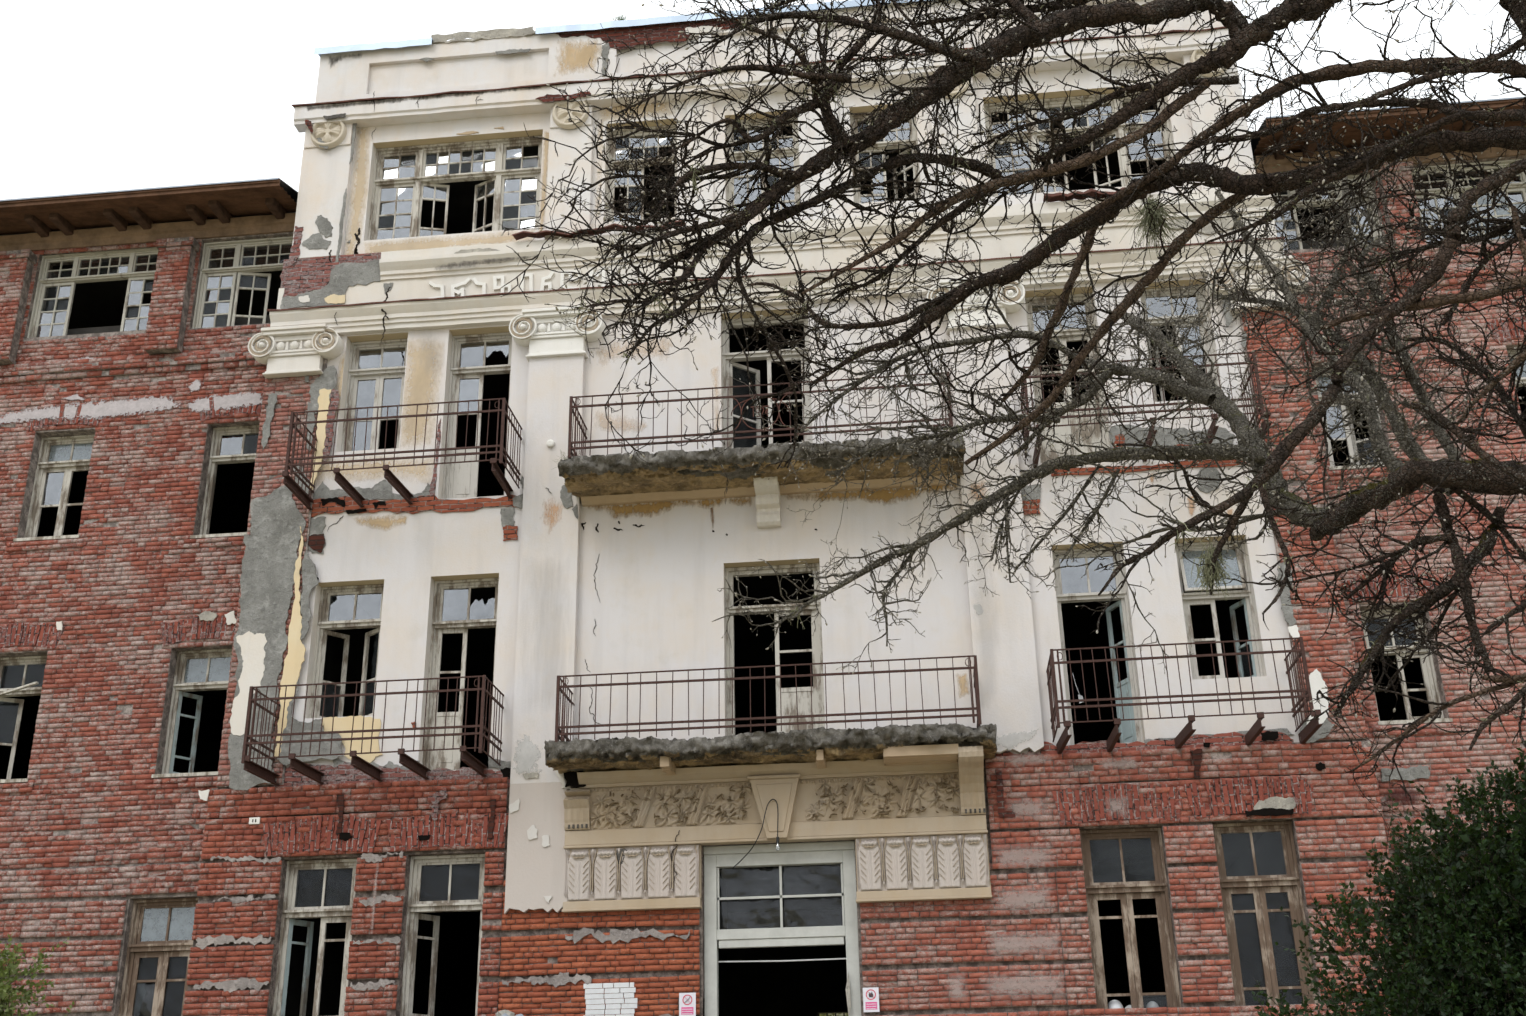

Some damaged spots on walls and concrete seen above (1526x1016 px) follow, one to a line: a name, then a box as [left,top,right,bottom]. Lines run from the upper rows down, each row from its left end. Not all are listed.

peeling [349,123,357,164]
spalling [280,188,393,309]
spalling [560,485,578,519]